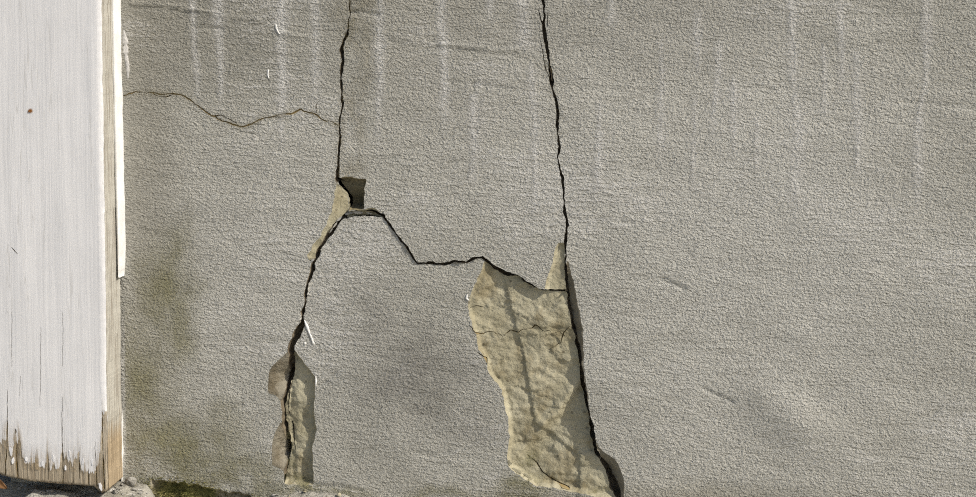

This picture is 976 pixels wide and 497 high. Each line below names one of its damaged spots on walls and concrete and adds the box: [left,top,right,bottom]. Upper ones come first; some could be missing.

crack [123,0,351,182]
water stain [277,0,286,119]
spalling [307,176,382,260]
crack [280,0,621,497]
peeling [0,411,109,492]
spalling [268,350,317,486]
spalling [465,243,624,497]